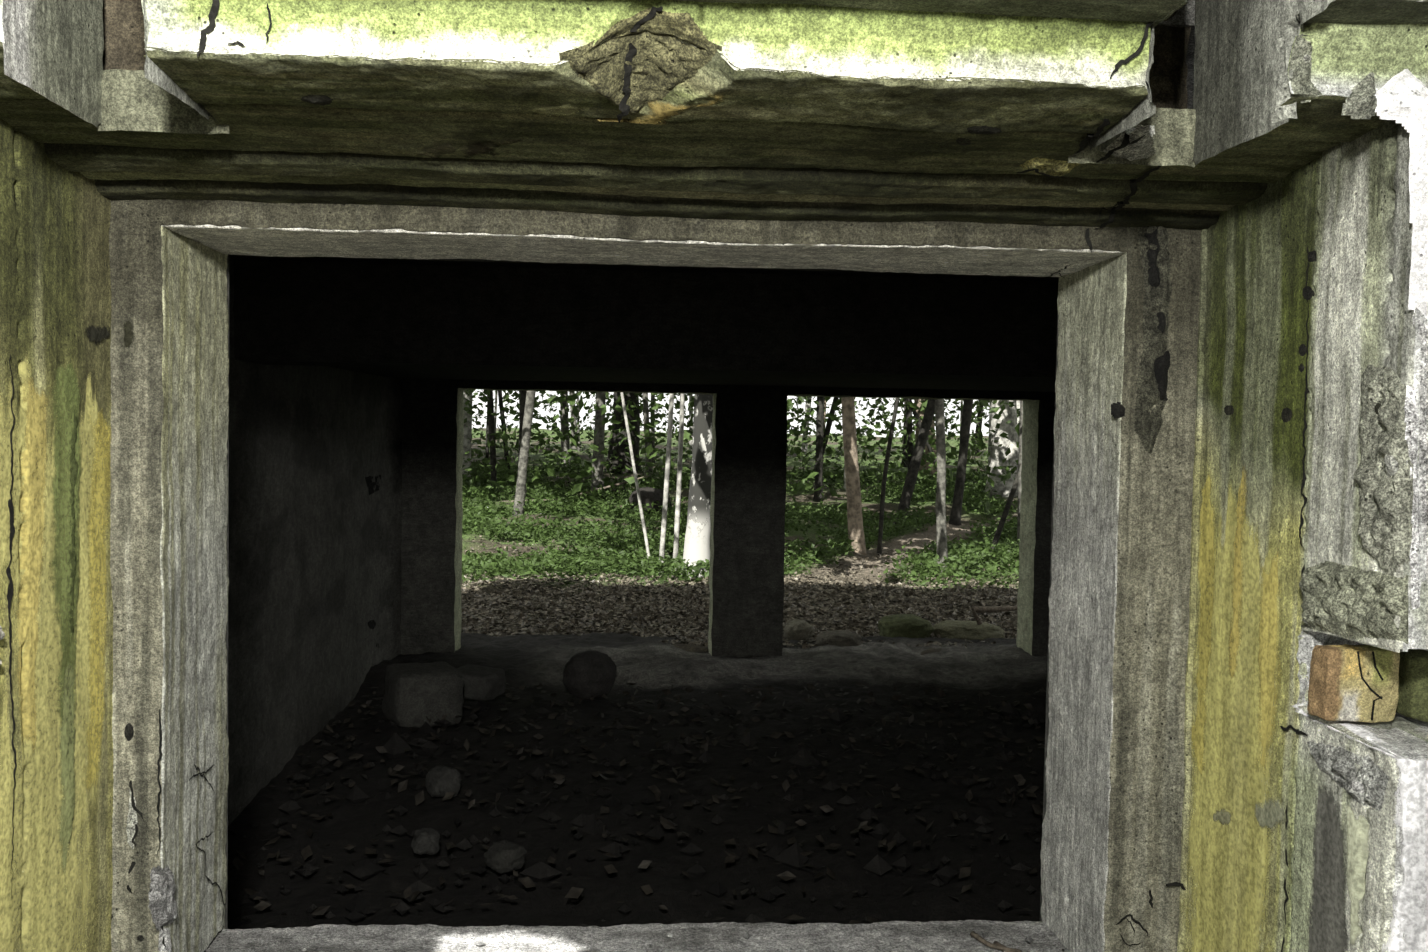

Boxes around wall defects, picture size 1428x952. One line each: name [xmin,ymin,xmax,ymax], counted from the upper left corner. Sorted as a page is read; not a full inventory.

crack [197,0,272,58]
spalling [559,6,722,123]
crack [1110,22,1154,79]
spalling [1341,72,1377,119]
spalling [1017,125,1156,179]
crack [1076,118,1110,154]
water stain [85,321,134,347]
spalling [1299,364,1413,644]
water stain [17,362,111,869]
water stain [1192,477,1216,775]
water stain [1213,809,1231,825]